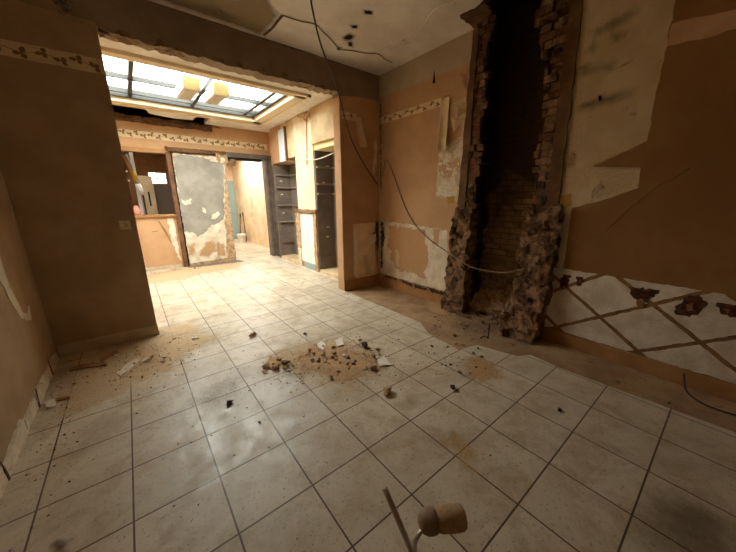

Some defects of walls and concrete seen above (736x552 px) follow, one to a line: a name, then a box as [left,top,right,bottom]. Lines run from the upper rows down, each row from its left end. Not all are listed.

flaking render [460,2,492,29]
flaking render [98,27,185,57]
peeling [208,156,236,166]
flaking render [497,0,736,385]
flaking render [353,103,489,321]